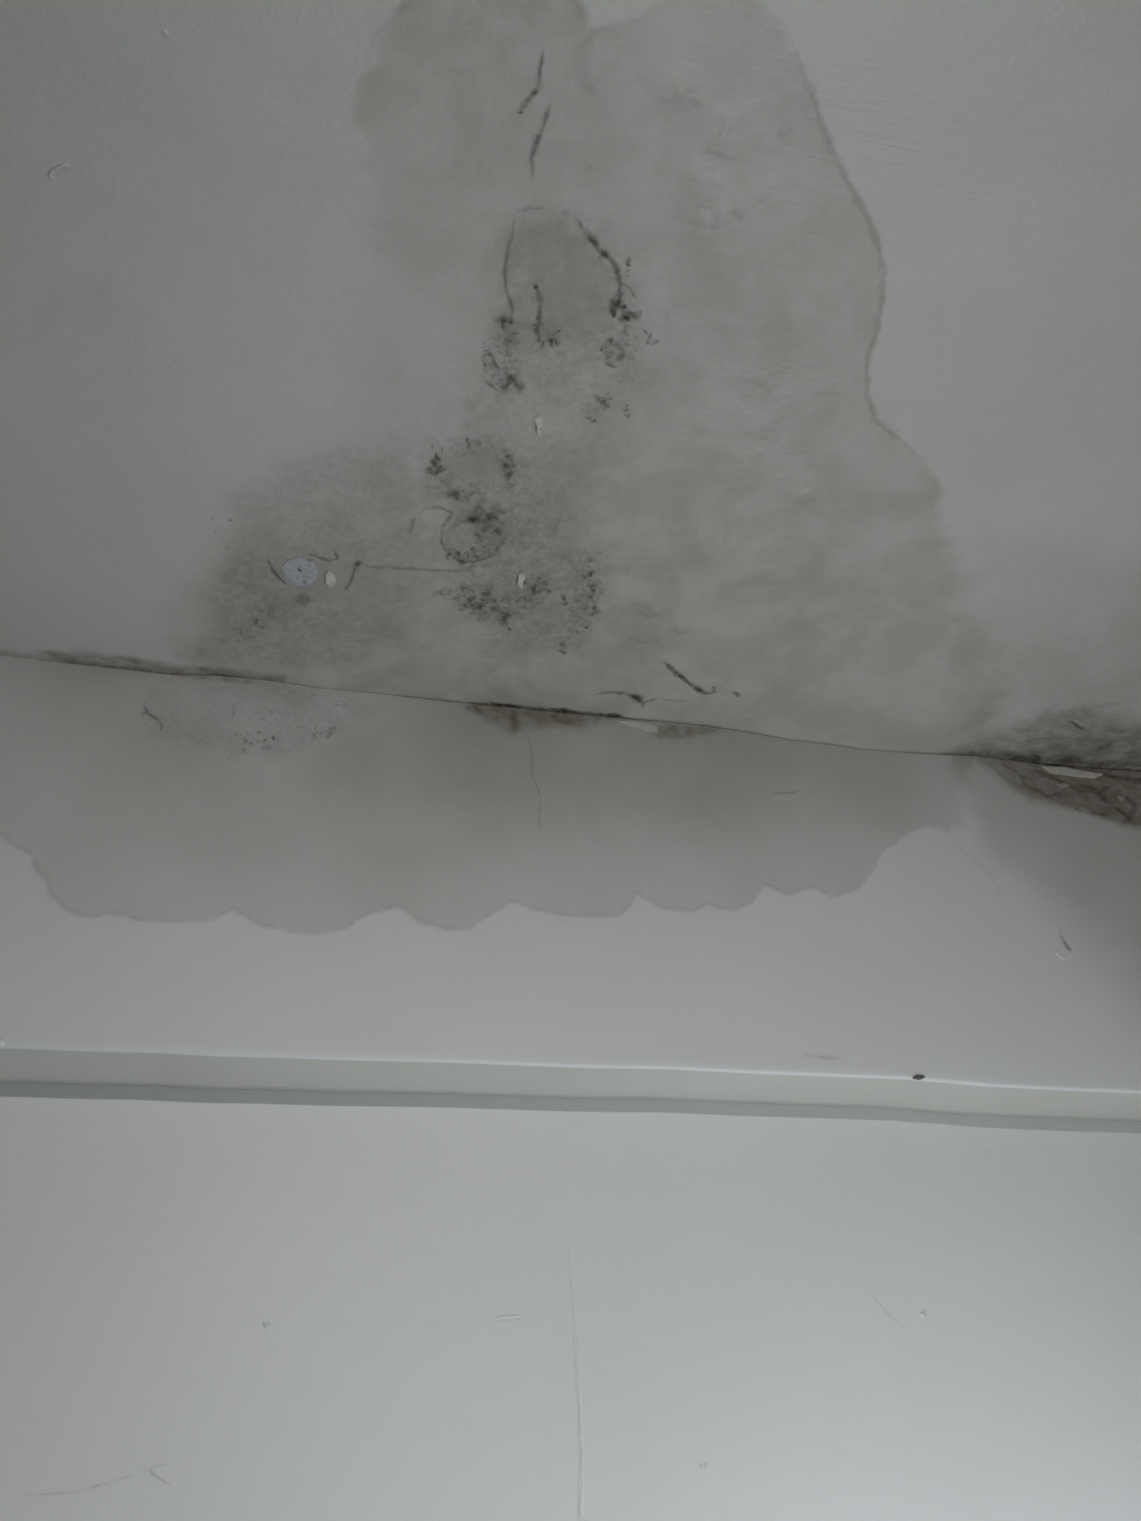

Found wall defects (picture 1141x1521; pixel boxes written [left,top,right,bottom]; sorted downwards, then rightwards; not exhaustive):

damp [485,703,619,718]